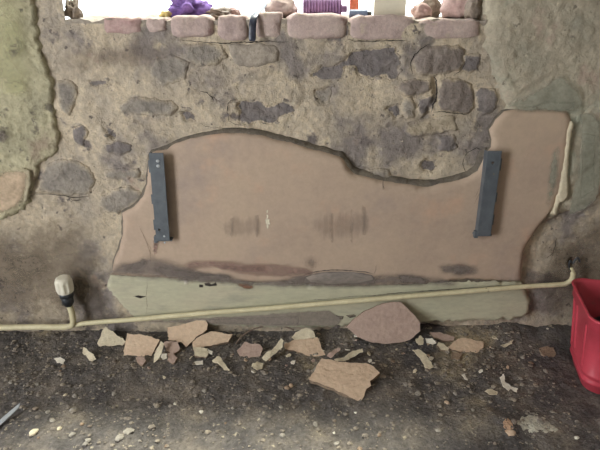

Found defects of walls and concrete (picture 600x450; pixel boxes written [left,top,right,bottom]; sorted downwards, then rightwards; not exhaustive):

flaking render [56,79,78,116]
flaking render [119,96,197,122]
flaking render [150,43,279,87]
spalling [233,98,295,127]
spalling [307,44,498,120]
flaking render [72,124,89,147]
flaking render [99,121,132,156]
flaking render [97,167,142,215]
water stain [0,233,103,314]
water stain [112,259,453,286]
water stain [442,265,474,274]
water stain [529,234,600,305]